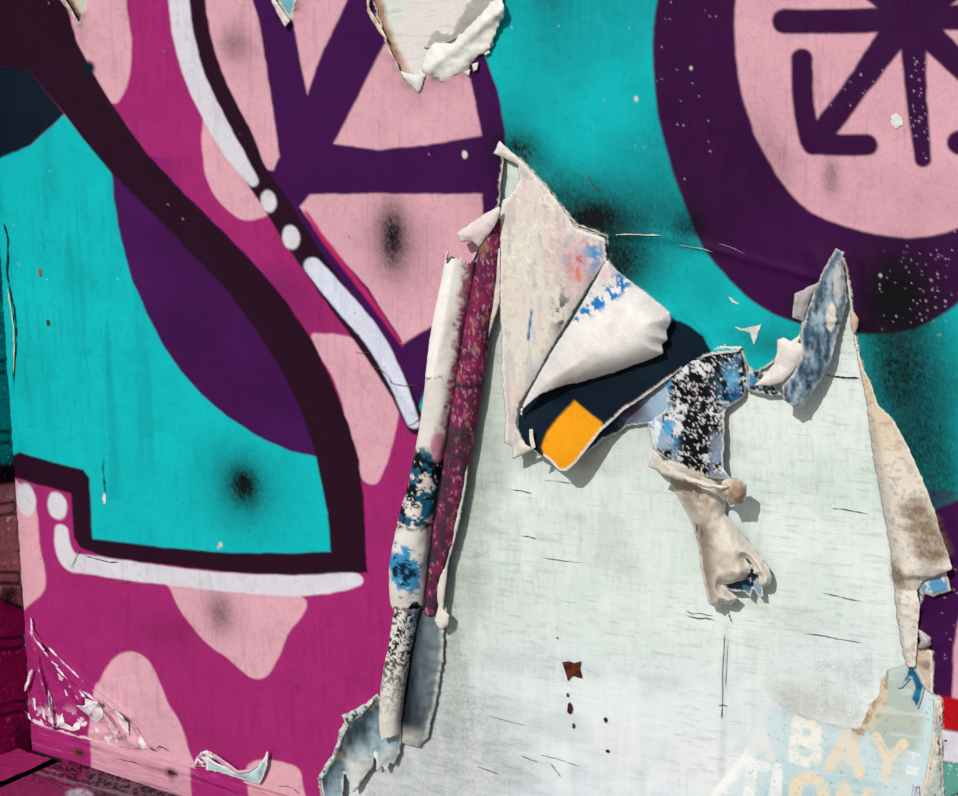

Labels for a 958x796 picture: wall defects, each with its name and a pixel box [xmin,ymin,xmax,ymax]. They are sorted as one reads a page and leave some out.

peeling [735,324,761,344]